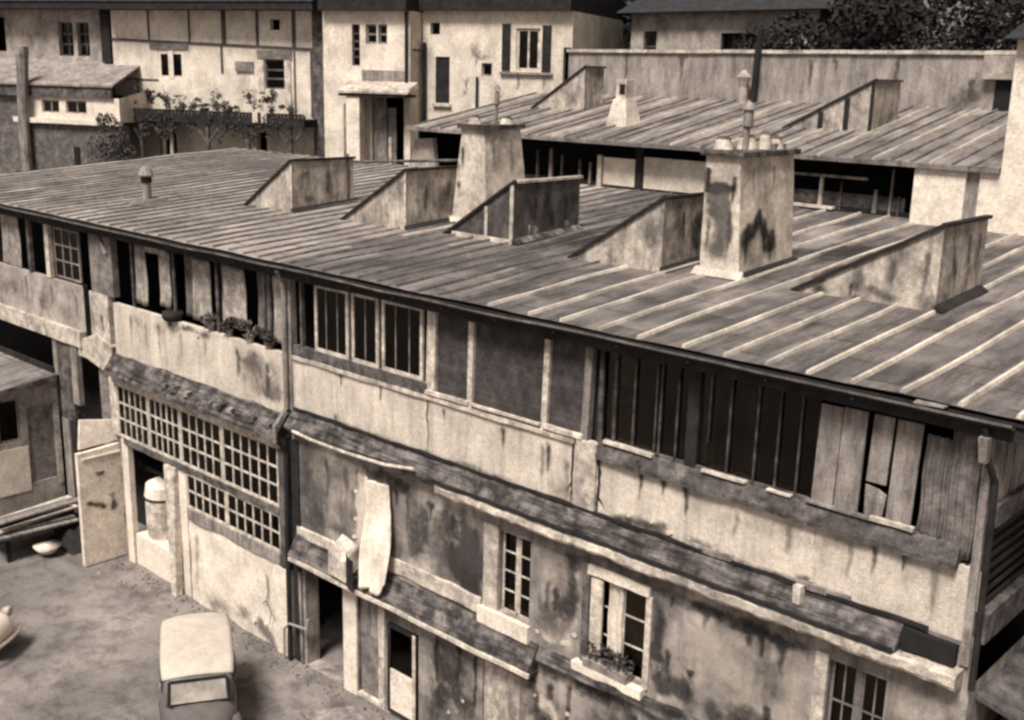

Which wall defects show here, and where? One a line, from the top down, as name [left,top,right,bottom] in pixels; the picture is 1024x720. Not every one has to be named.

damp [236,349,280,399]
crack [566,444,604,511]
damp [356,470,482,597]
damp [543,554,580,624]
damp [650,597,805,720]